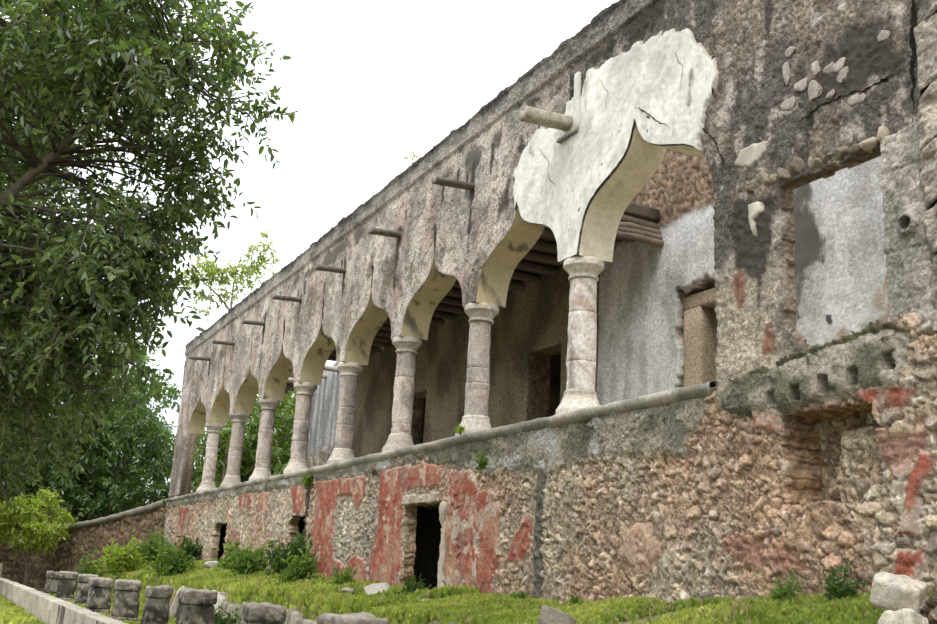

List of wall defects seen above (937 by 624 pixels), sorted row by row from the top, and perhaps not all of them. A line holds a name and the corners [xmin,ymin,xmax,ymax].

spalling [782,46,849,110]
crack [794,0,918,130]
spalling [847,92,866,106]
spalling [877,30,890,42]
peeling [291,462,535,594]